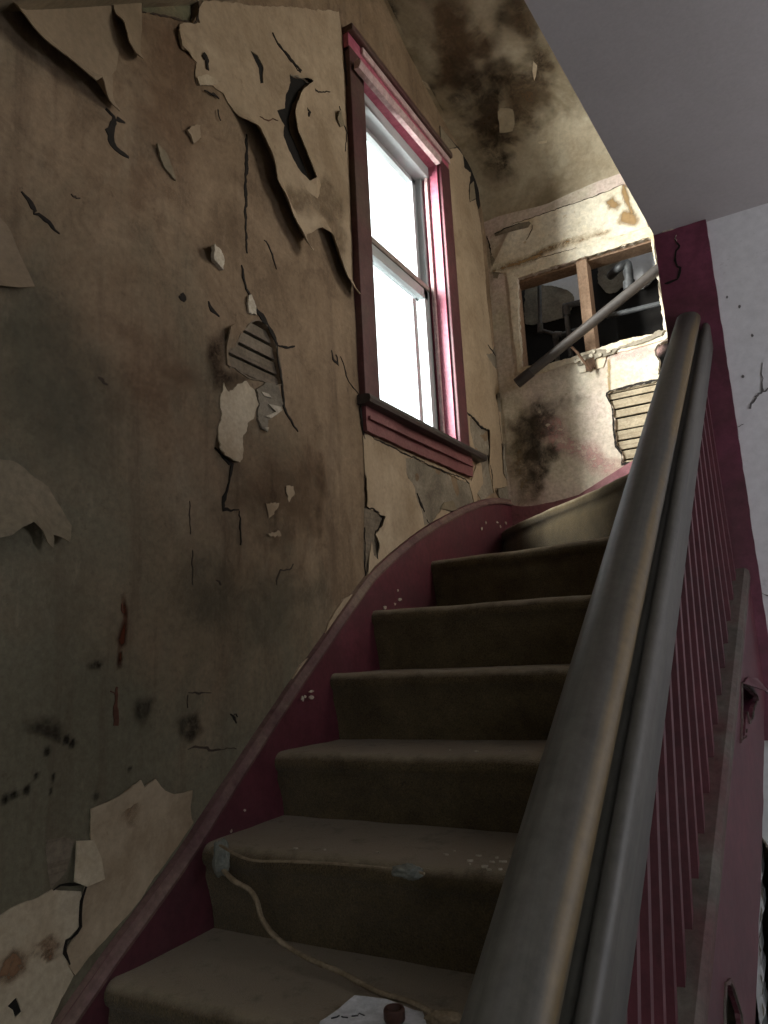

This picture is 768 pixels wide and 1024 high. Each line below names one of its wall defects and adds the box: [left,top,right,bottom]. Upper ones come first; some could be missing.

damp [434,1,549,175]
crack [21,191,60,234]
peeling [211,244,225,271]
crack [241,116,298,432]
spalling [597,252,655,294]
crack [662,228,682,284]
spalling [217,381,283,463]
damp [511,403,558,504]
crack [738,363,768,427]
crack [215,447,242,545]
spalling [363,506,384,576]
peeling [0,779,194,1024]